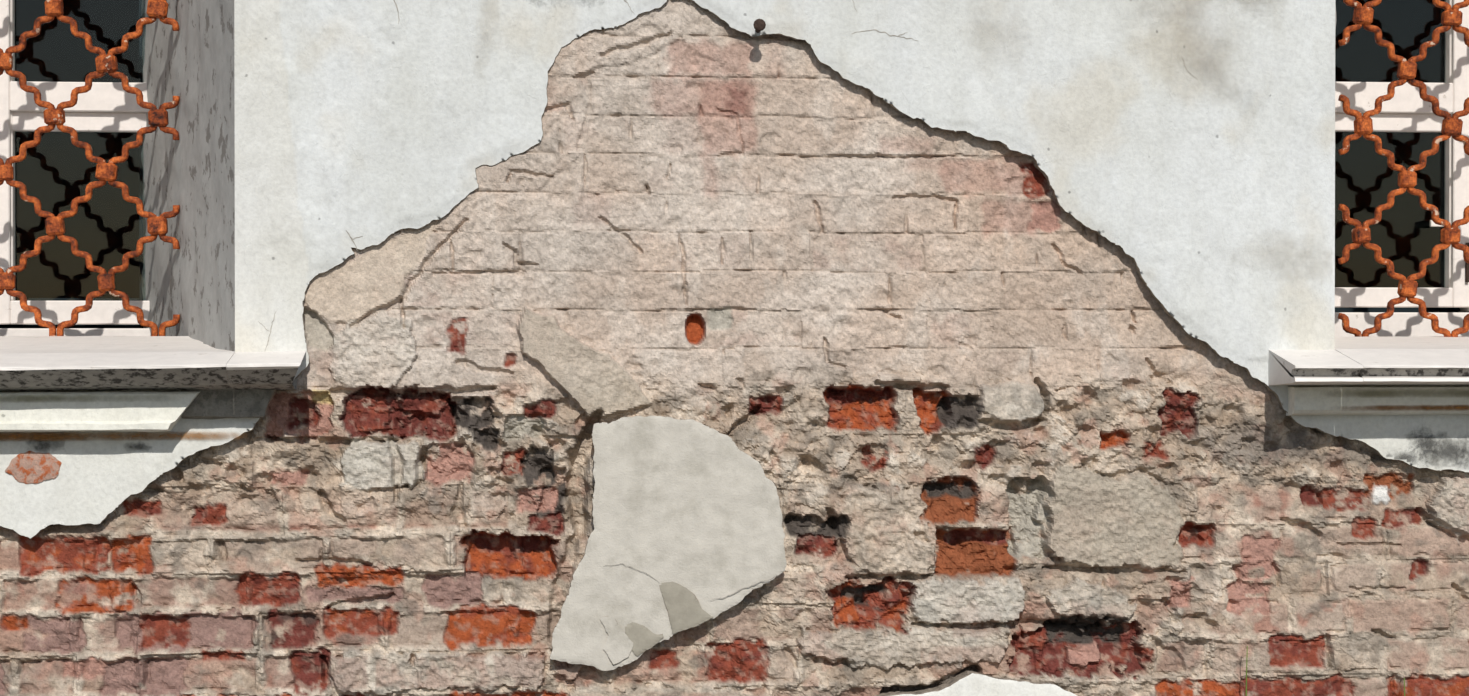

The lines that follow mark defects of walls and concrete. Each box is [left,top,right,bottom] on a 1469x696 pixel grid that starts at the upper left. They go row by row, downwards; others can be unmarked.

flaking render [1016,151,1086,227]
flaking render [518,306,653,420]
spalling [1157,387,1202,441]
flaking render [18,534,112,579]
flaking render [109,534,155,575]
flaking render [122,497,163,519]
spalling [784,513,852,540]
spalling [933,527,1019,585]
spalling [826,576,918,636]
flaking render [0,576,139,696]
flaking render [704,638,770,685]
spalling [1006,621,1146,681]